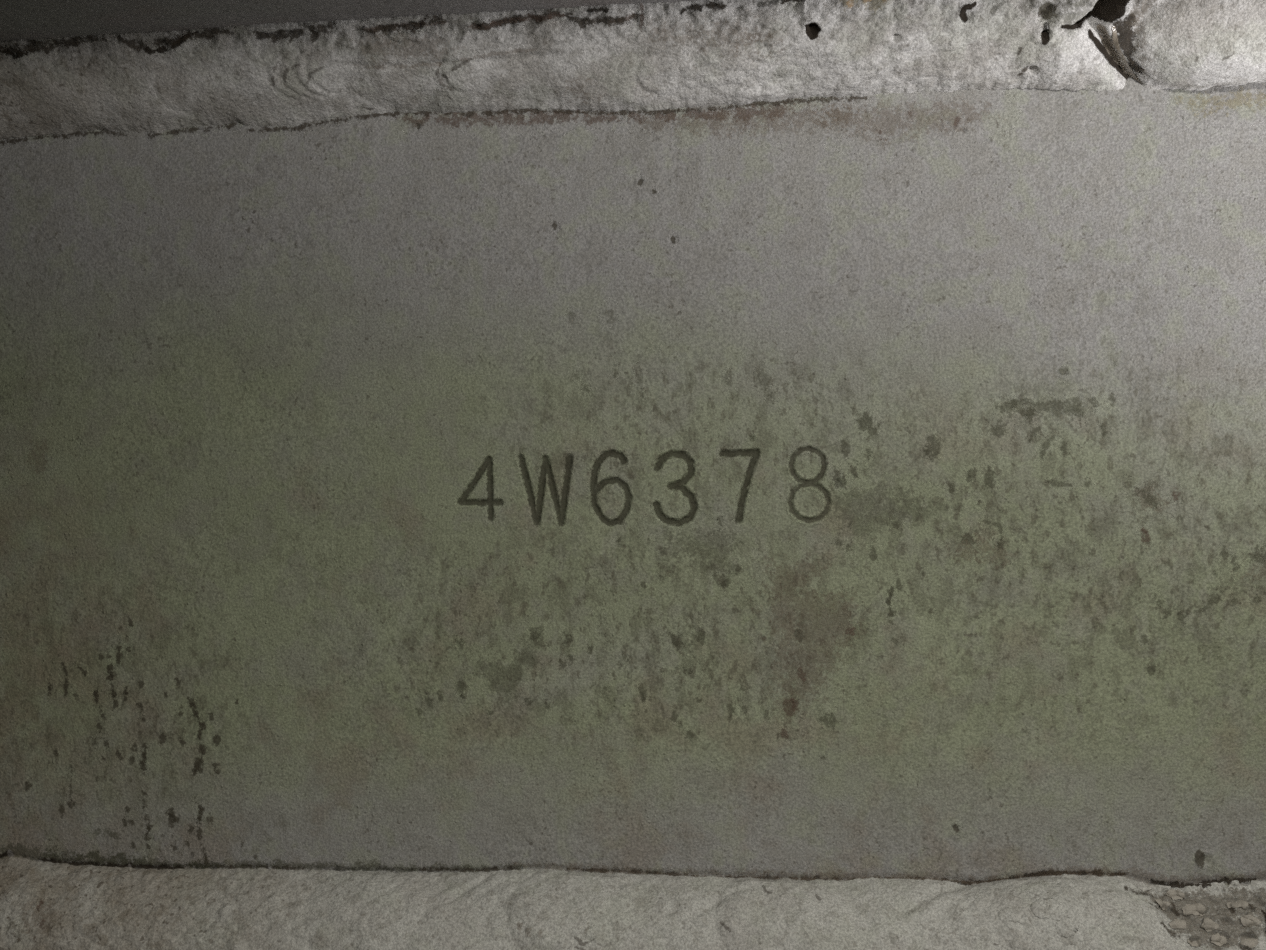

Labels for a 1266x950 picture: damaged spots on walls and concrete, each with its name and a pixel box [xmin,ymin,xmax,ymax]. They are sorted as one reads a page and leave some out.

leakage [92,616,221,776]
leakage [166,802,213,865]
peeling [1124,886,1261,950]